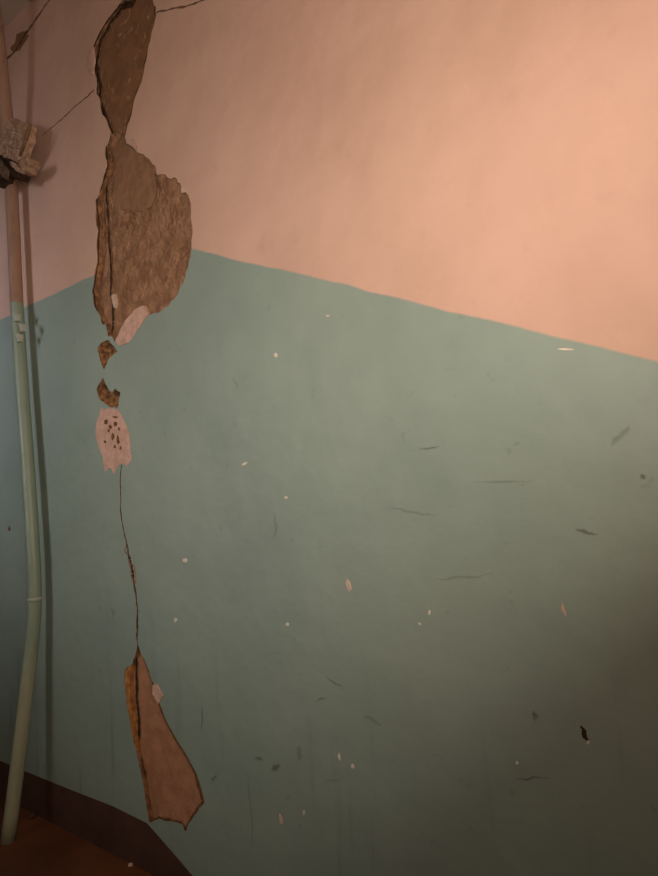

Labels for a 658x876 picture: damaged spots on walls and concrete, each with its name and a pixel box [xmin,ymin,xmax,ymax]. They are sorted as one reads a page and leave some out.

crack [156,0,204,13]
peeling [0,144,41,177]
spalling [87,0,193,367]
peeling [95,381,132,473]
spalling [125,652,205,831]